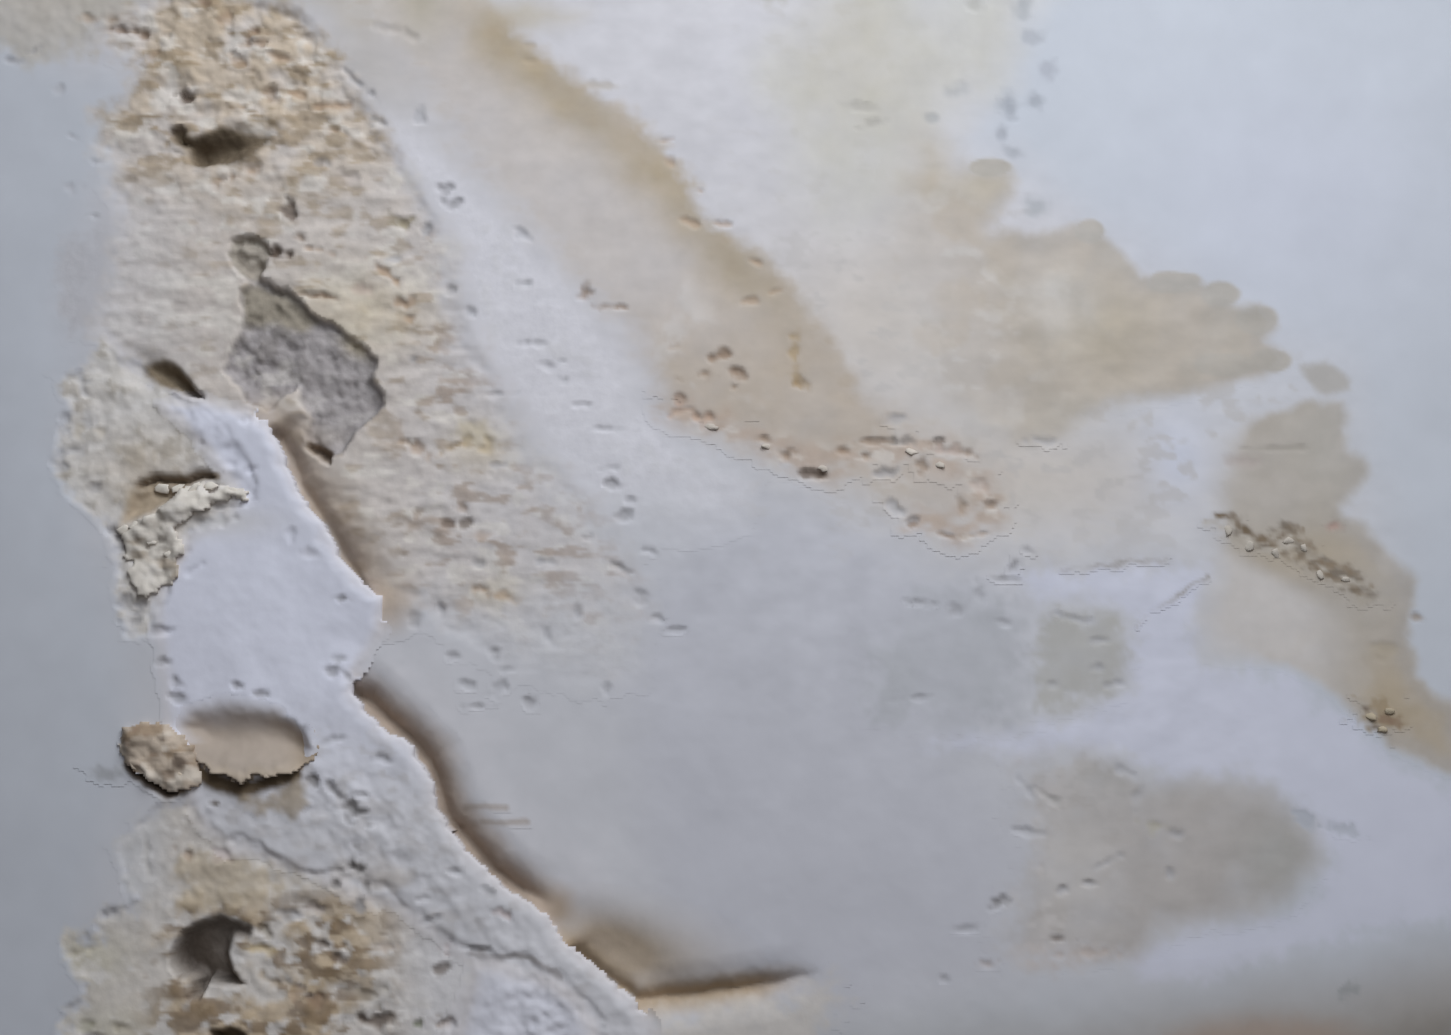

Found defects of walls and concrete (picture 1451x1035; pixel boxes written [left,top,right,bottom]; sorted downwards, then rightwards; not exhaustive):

leakage [0,0,103,100]
flaking render [42,0,770,1035]
leakage [306,0,1451,779]
leakage [831,569,1451,1035]